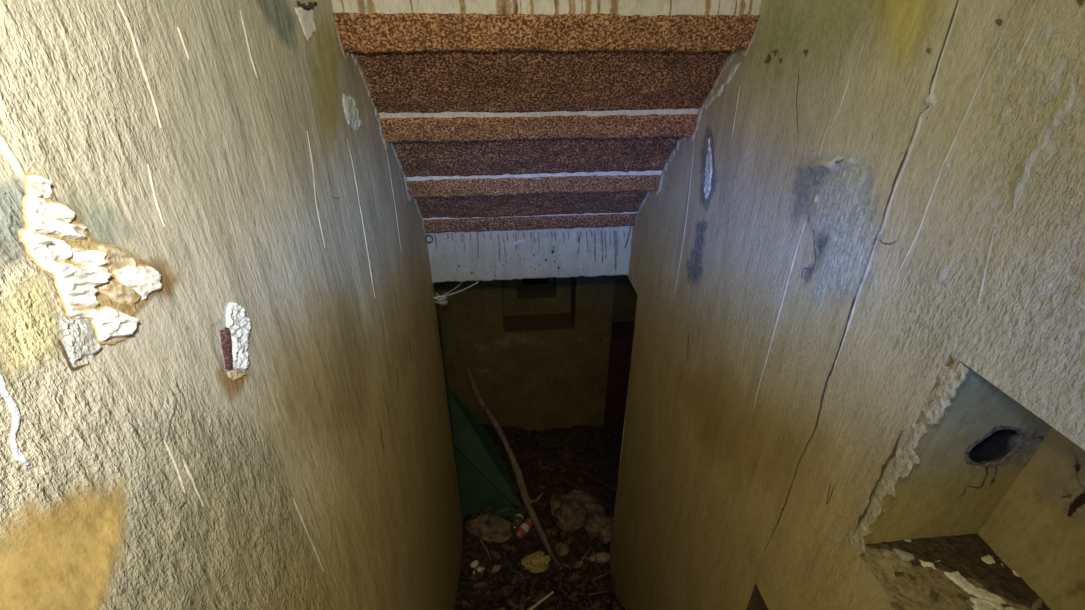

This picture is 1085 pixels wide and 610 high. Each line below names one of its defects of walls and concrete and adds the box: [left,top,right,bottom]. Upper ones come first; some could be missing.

flaking render [17,172,162,365]
spalling [211,301,251,394]
crack [760,0,961,562]
water stain [0,493,122,610]
flaking render [844,350,1043,610]